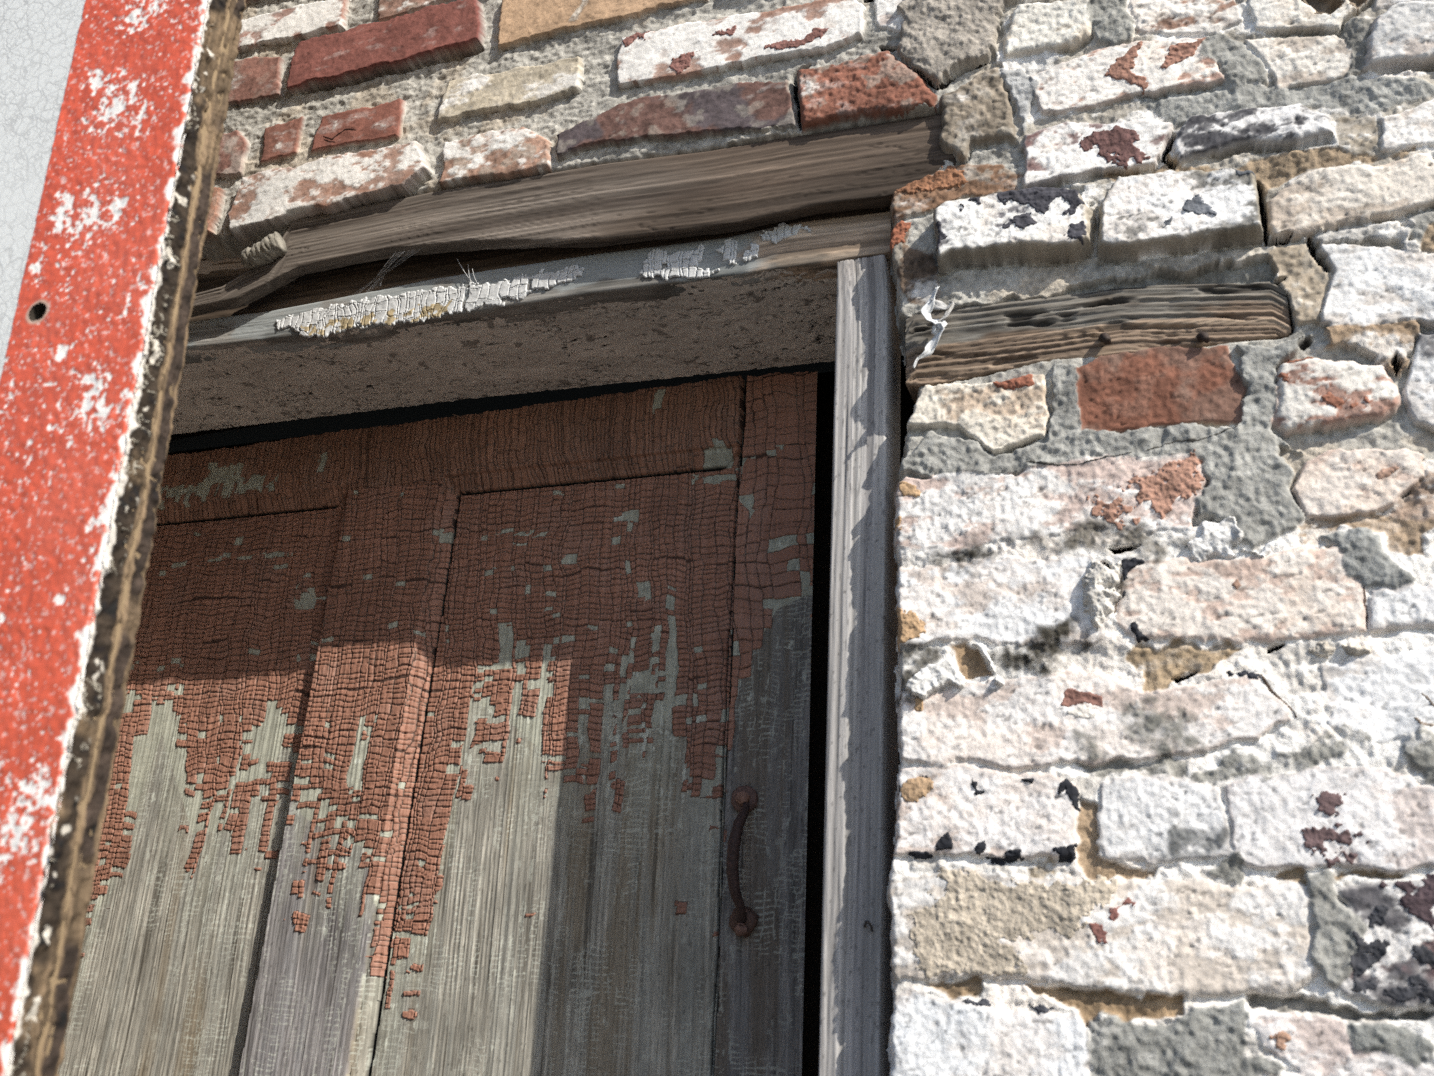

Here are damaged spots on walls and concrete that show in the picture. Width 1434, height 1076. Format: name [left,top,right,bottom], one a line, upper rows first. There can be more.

peeling [622,31,651,47]
peeling [669,49,702,75]
peeling [712,25,737,36]
peeling [764,27,829,50]
peeling [639,222,811,281]
crack [1257,184,1328,335]
peeling [276,265,584,338]
peeling [86,371,817,1020]